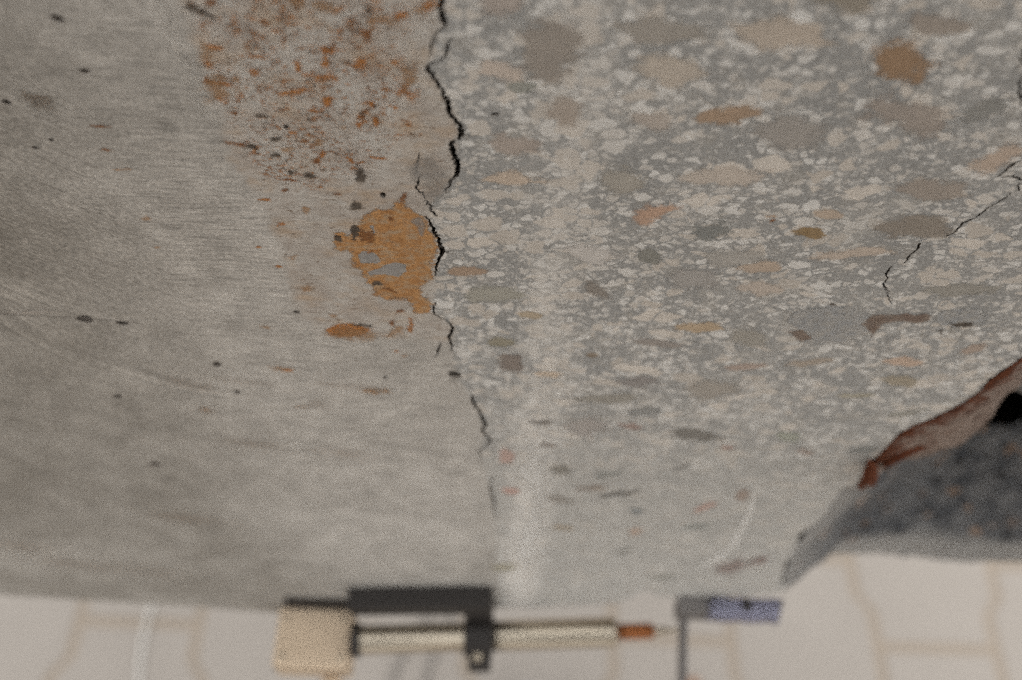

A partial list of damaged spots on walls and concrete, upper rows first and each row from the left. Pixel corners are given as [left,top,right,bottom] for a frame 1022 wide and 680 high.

corrosion [185,0,437,192]
crack [415,0,471,273]
crack [1014,57,1022,107]
crack [944,161,1022,238]
corrosion [326,315,414,341]
crack [432,302,455,357]
crack [882,243,921,302]
crack [470,395,496,520]
spalling [780,384,1022,590]
corrosion [857,359,1022,491]